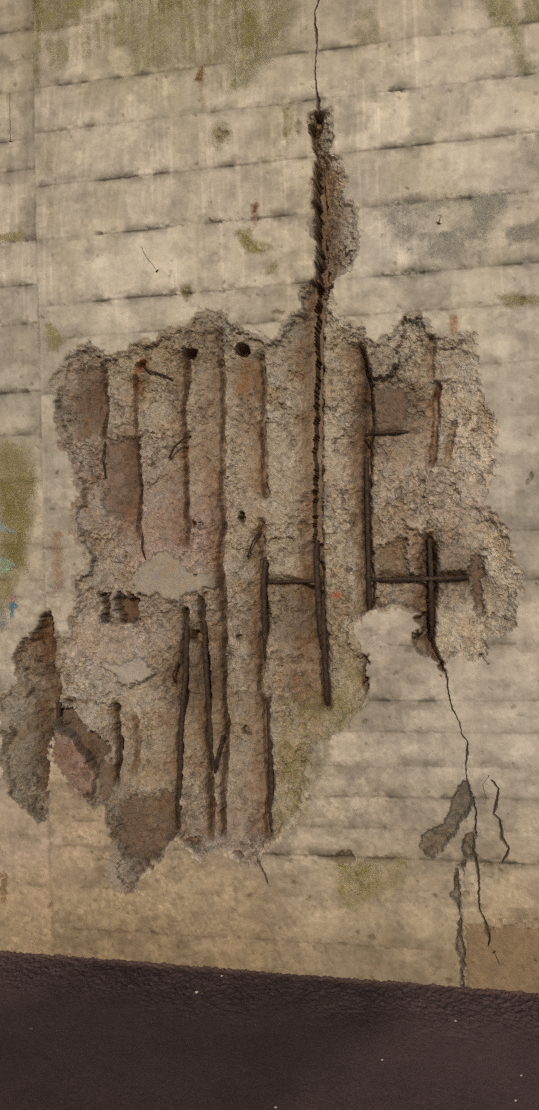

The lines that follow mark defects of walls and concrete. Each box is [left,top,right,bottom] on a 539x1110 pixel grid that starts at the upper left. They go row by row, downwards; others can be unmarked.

spalling [0,107,525,896]
crack [311,0,332,548]
spalling [419,781,477,986]
crack [442,672,513,966]